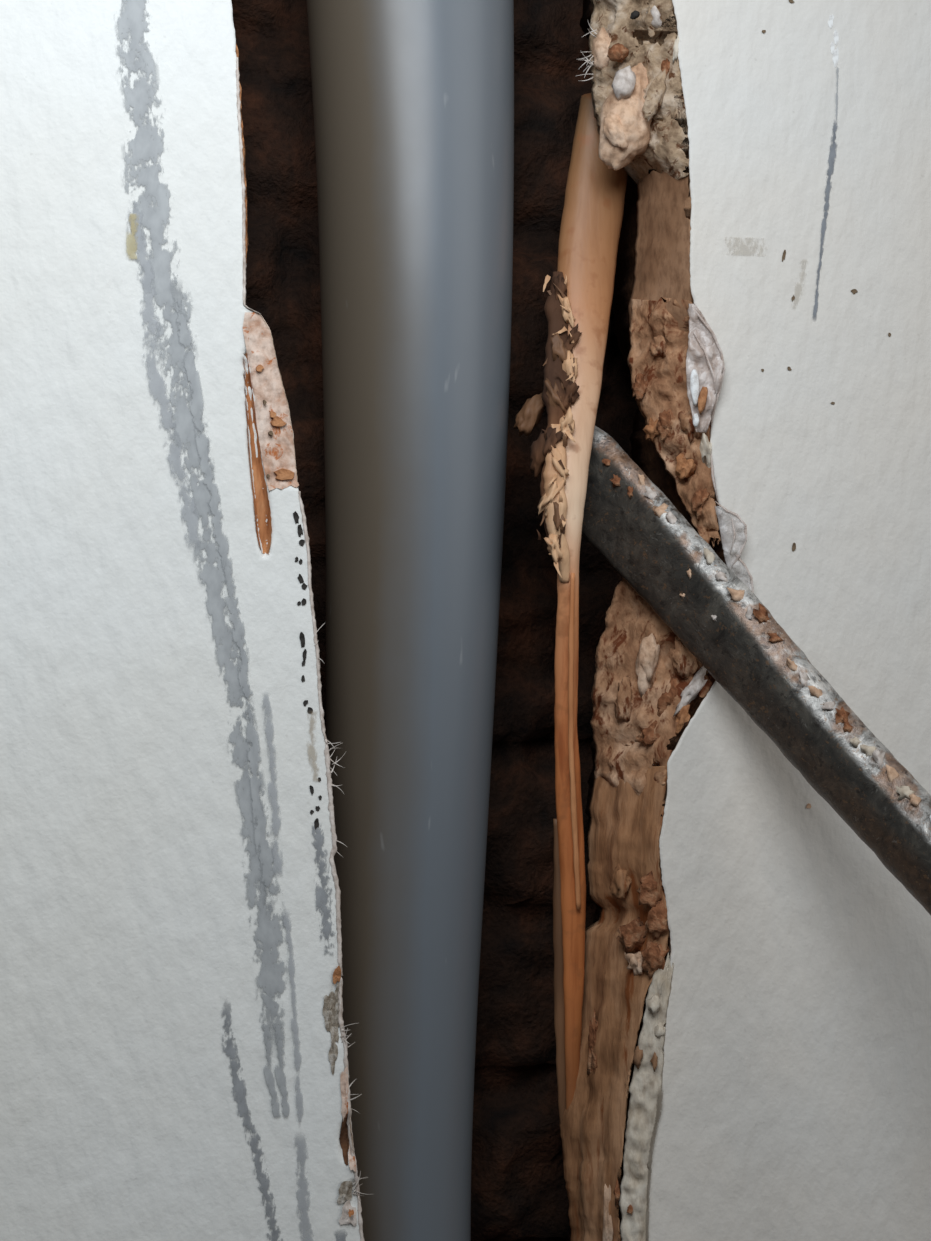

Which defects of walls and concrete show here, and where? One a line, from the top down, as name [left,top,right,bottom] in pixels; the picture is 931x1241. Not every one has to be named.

leakage [117,0,303,1122]
flaking render [239,80,248,264]
flaking render [243,312,299,554]
peeling [538,274,582,564]
flaking render [577,0,754,593]
leakage [312,826,334,954]
flaking render [559,577,715,1241]
leakage [222,1007,283,1241]
leakage [295,1139,313,1241]
flaking render [323,966,357,1226]